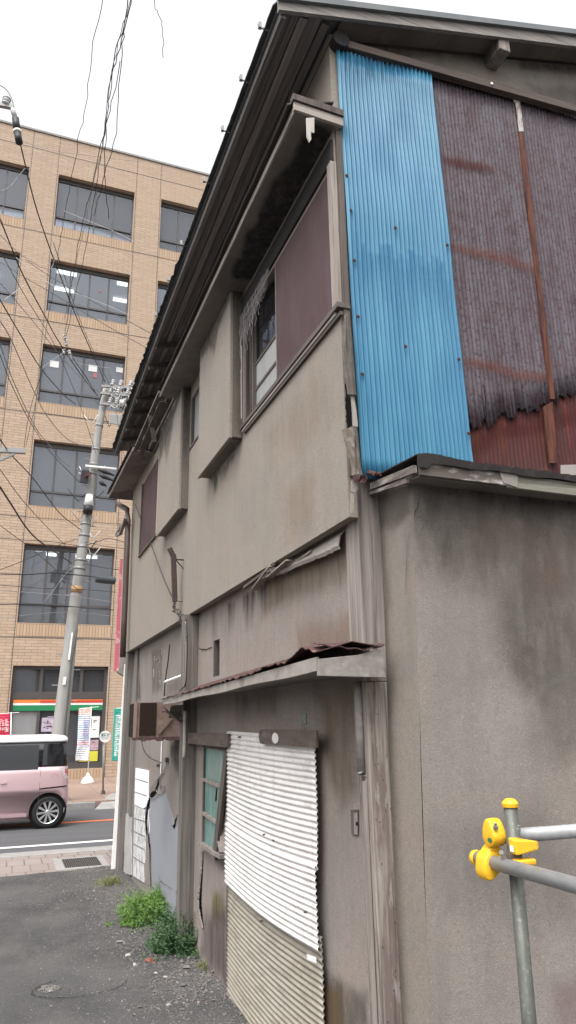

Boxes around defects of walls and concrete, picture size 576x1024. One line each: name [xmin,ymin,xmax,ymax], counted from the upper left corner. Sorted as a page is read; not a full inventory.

peeling [342,312,368,513]
corrosion [469,392,576,474]
corrosion [162,641,385,700]
peeling [144,794,178,917]
crack [196,851,204,943]